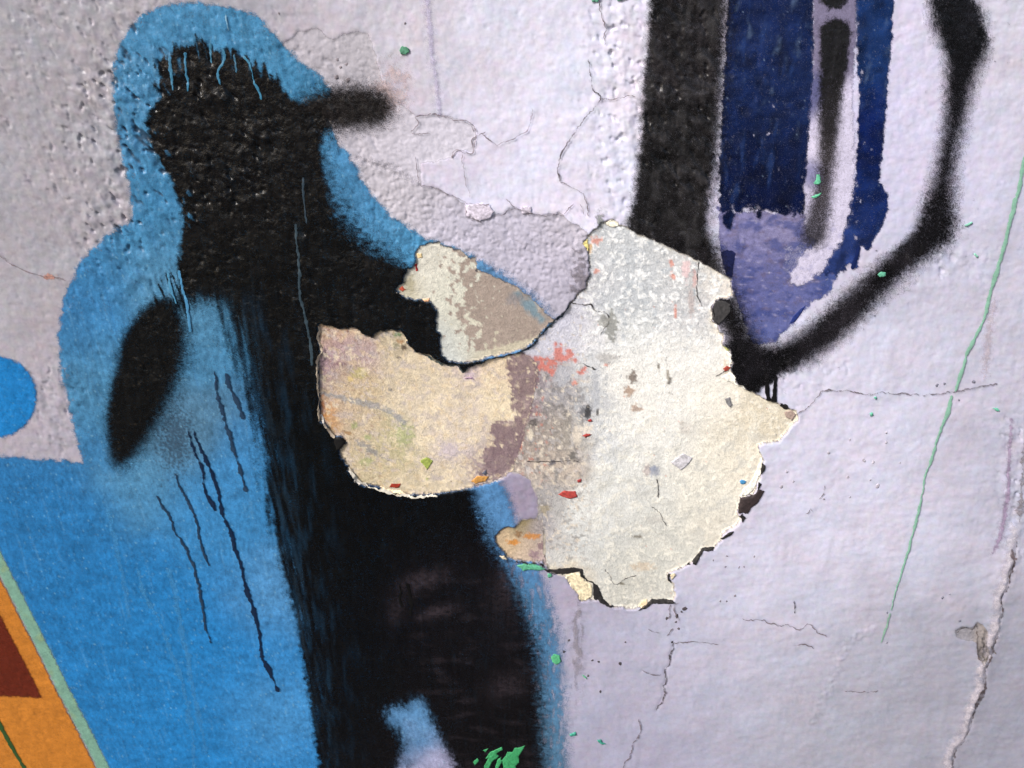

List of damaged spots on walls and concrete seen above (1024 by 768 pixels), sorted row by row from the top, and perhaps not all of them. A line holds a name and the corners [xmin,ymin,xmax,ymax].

crack [411,0,635,223]
peeling [282,28,798,611]
crack [798,383,997,413]
crack [623,604,717,768]
crack [743,601,826,649]
crack [952,452,1024,767]